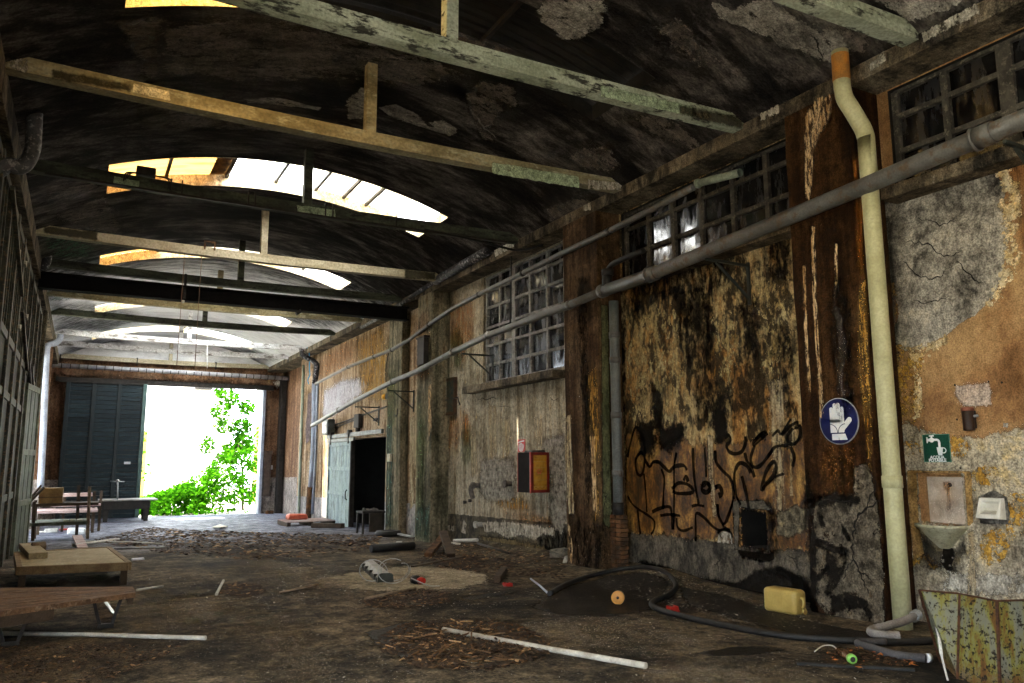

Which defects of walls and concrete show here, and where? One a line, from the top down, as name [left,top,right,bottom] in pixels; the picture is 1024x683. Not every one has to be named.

peeling [116,15,464,136]
peeling [458,33,512,53]
peeling [465,81,518,142]
peeling [536,0,608,41]
peeling [711,0,886,71]
peeling [804,94,831,200]
damp [620,226,873,622]
flaking render [885,169,1024,622]
spalling [718,463,885,623]